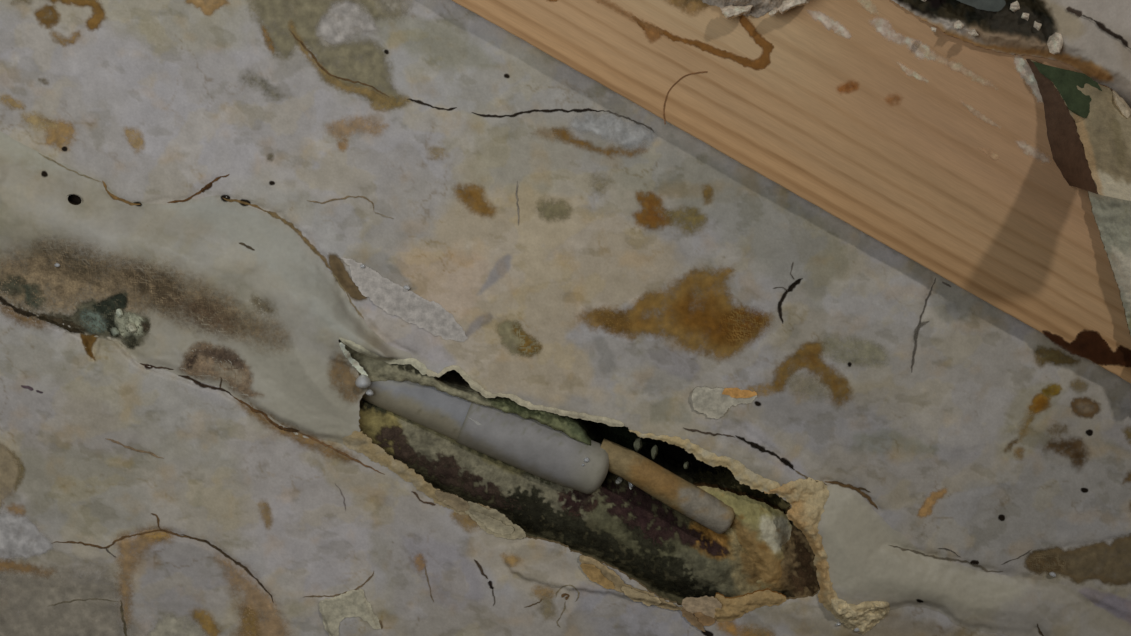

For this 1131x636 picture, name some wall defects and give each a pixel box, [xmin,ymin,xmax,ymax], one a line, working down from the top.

rust [35,0,105,45]
crack [290,31,654,132]
rust [635,186,712,233]
damp [0,247,281,349]
flaking render [340,257,468,342]
rust [582,269,769,358]
crack [773,263,803,323]
rust [749,338,885,404]
flaking render [339,337,890,635]
crack [51,513,273,601]
crack [305,571,374,597]
damp [1025,535,1131,585]